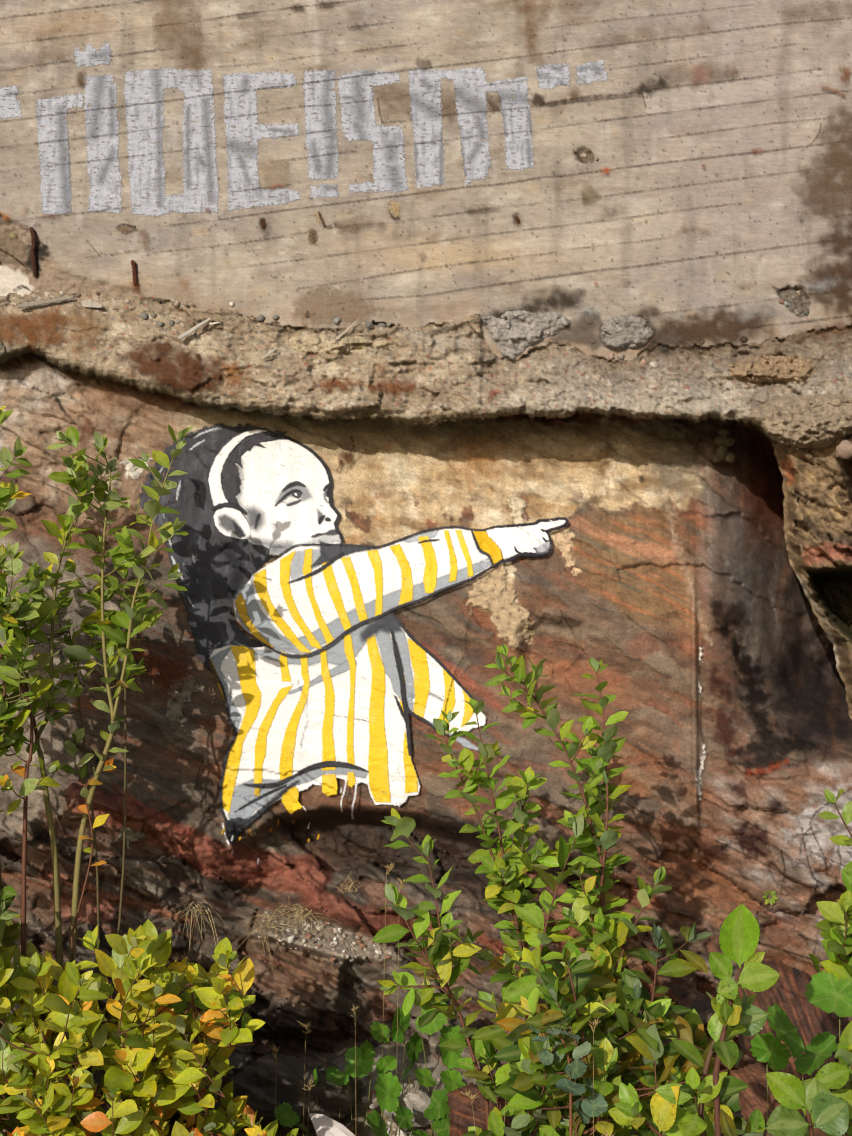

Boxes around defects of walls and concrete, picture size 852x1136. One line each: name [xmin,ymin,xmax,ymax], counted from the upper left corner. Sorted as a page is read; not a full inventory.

spalling [116,223,137,233]
spalling [308,212,336,243]
damp [804,108,852,336]
spalling [772,285,810,316]
spalling [289,333,389,355]
spalling [479,308,571,361]
spalling [598,314,655,350]